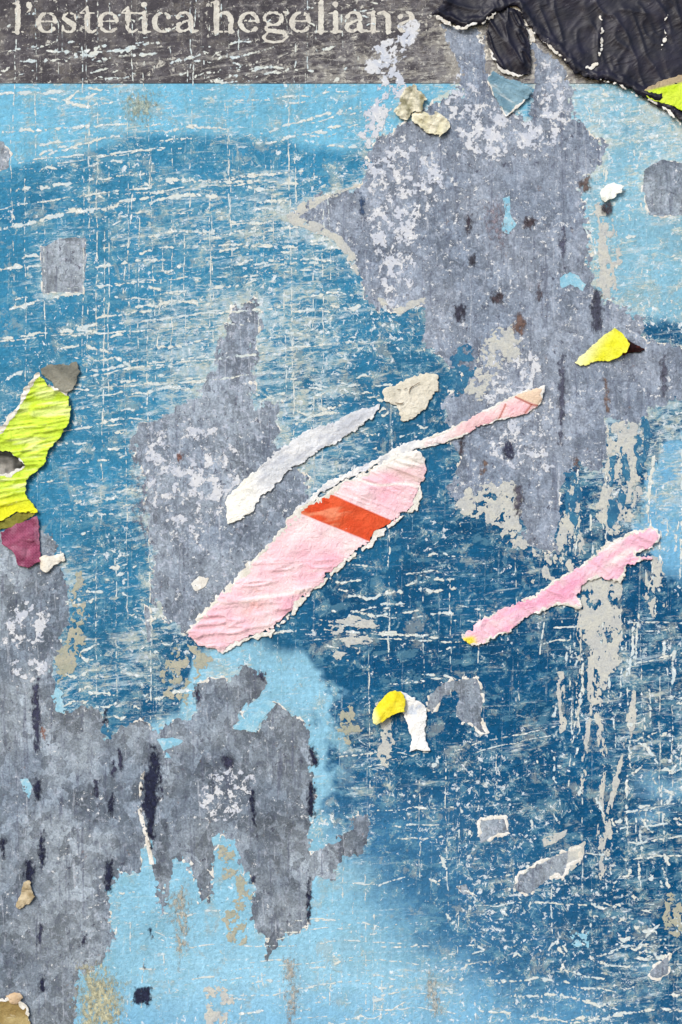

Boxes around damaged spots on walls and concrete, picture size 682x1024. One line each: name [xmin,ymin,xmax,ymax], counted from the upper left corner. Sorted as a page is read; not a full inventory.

peeling [40,237,87,295]
peeling [293,23,682,584]
peeling [0,296,372,1024]
peeling [426,676,489,736]
peeling [477,815,510,843]
peeling [508,845,583,896]